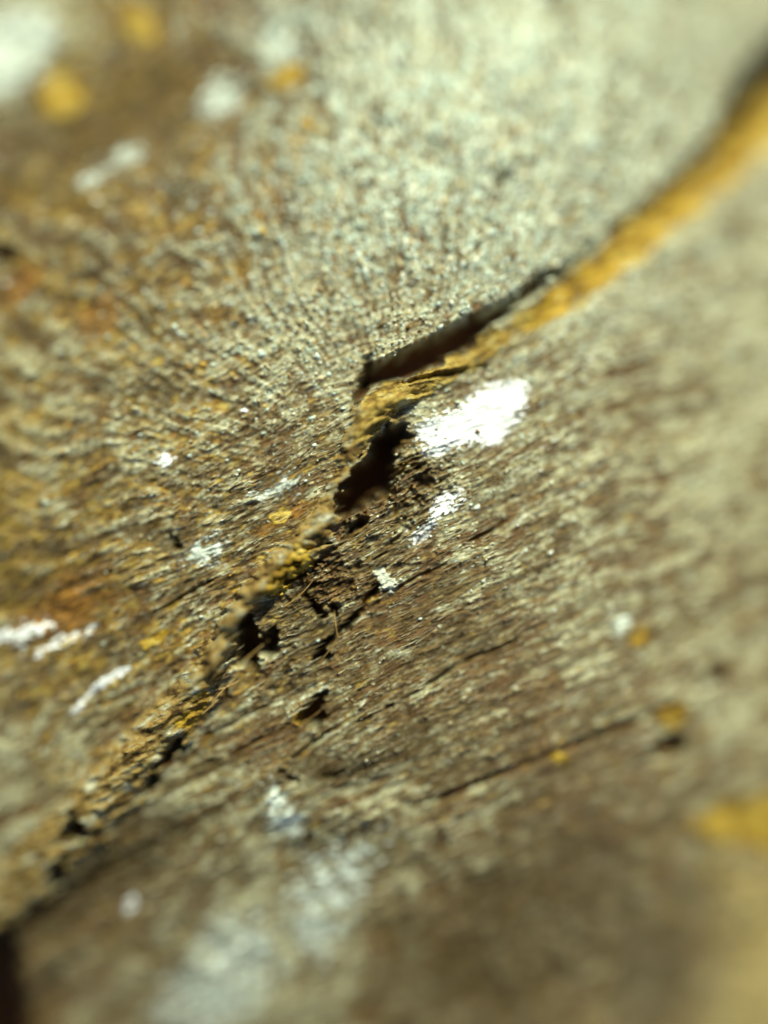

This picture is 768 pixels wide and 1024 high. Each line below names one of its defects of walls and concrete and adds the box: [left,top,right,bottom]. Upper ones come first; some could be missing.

crack [700,52,768,152]
crack [354,267,564,403]
crack [337,427,406,536]
crack [471,521,503,540]
crack [149,584,205,616]
crack [241,613,280,666]
crack [304,565,442,662]
crack [385,644,504,708]
crack [149,688,331,787]
crack [416,707,659,804]
crack [68,816,88,834]
crack [0,858,98,933]